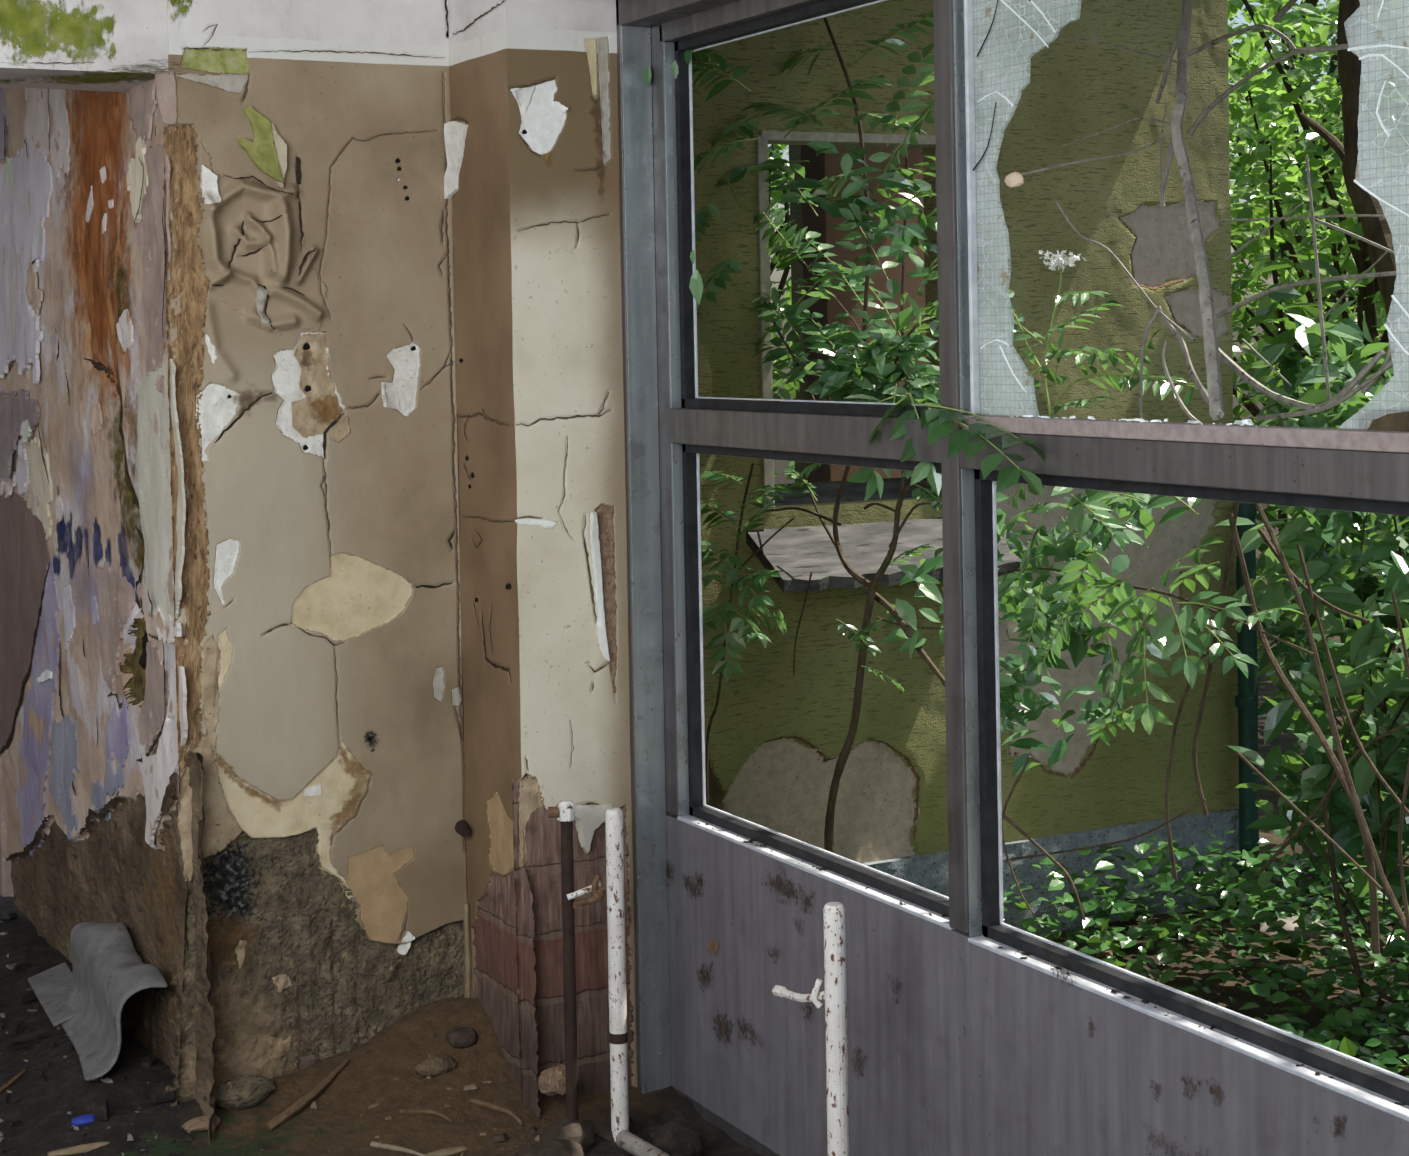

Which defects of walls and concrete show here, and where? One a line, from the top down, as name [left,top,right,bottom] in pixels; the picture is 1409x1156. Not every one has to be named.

water stain [170,0,187,20]
rust [65,90,136,418]
crack [251,0,611,848]
flaking render [1119,200,1231,339]
spalling [0,37,634,1144]
flaking render [708,736,921,863]